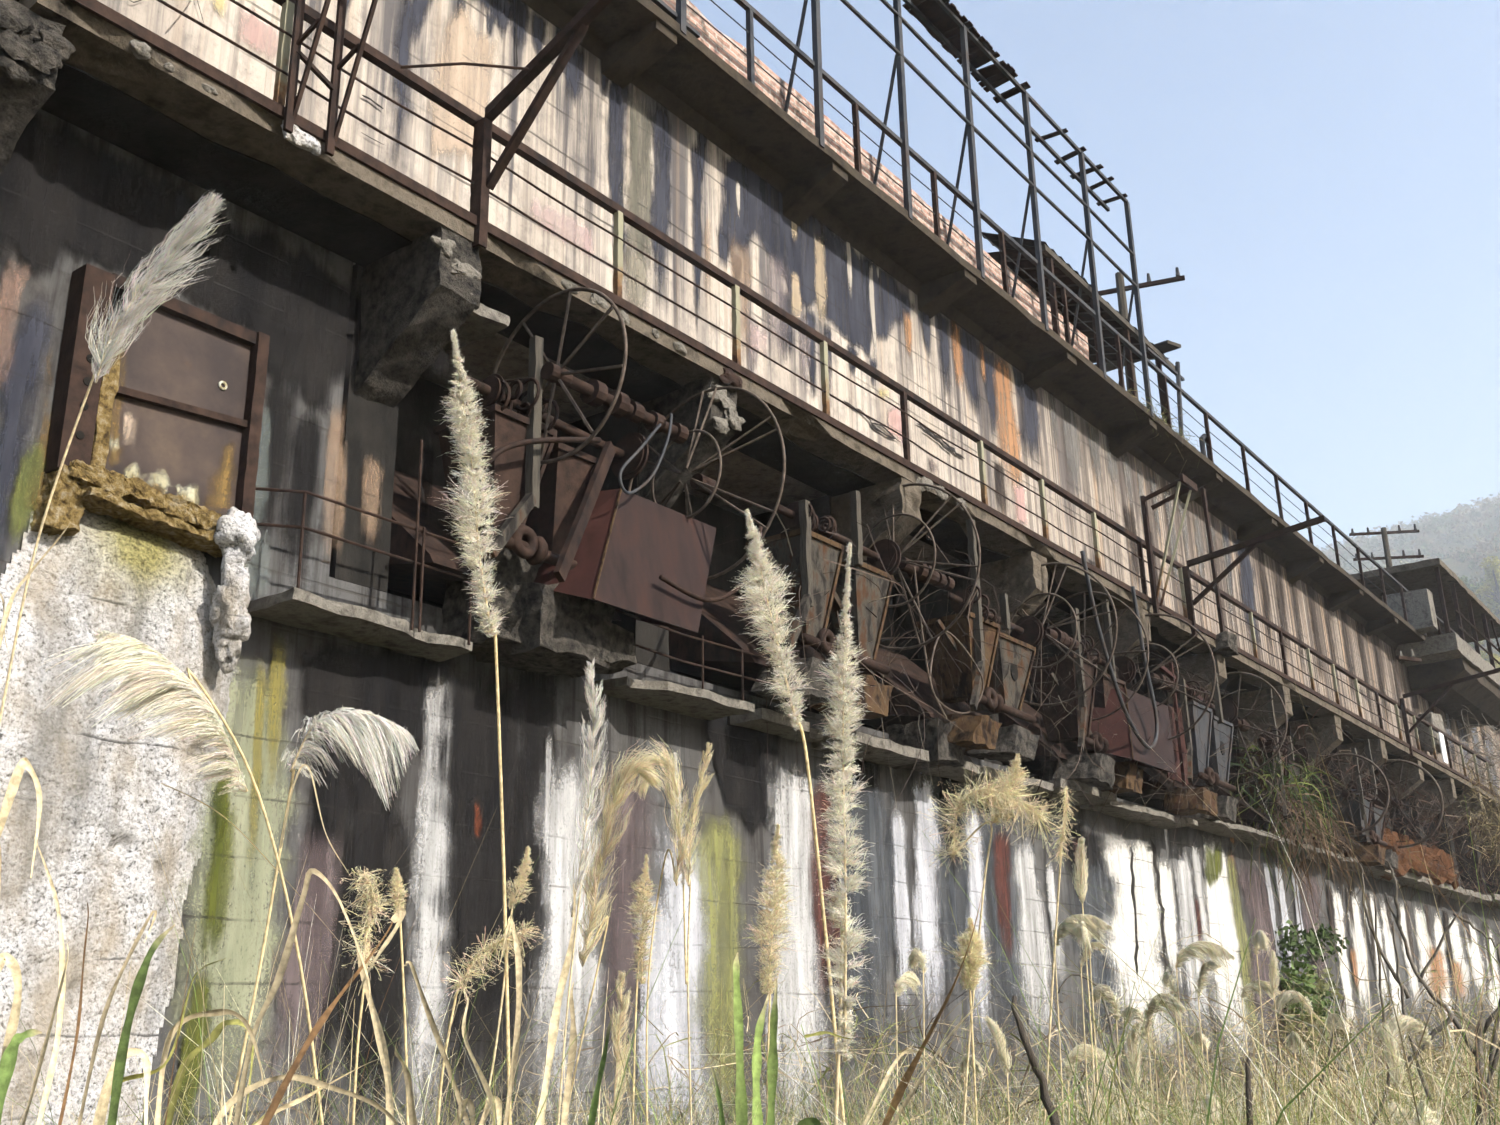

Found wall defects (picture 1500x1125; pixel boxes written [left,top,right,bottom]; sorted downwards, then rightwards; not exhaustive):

spalling [0,1,76,83]
damp [394,0,433,156]
damp [458,0,561,53]
damp [564,48,672,297]
damp [0,116,361,587]
damp [420,445,434,516]
corrosion [952,322,962,381]
corrosion [980,343,1022,482]
damp [691,133,1500,790]
damp [172,643,1500,1125]
crack [1129,838,1167,976]